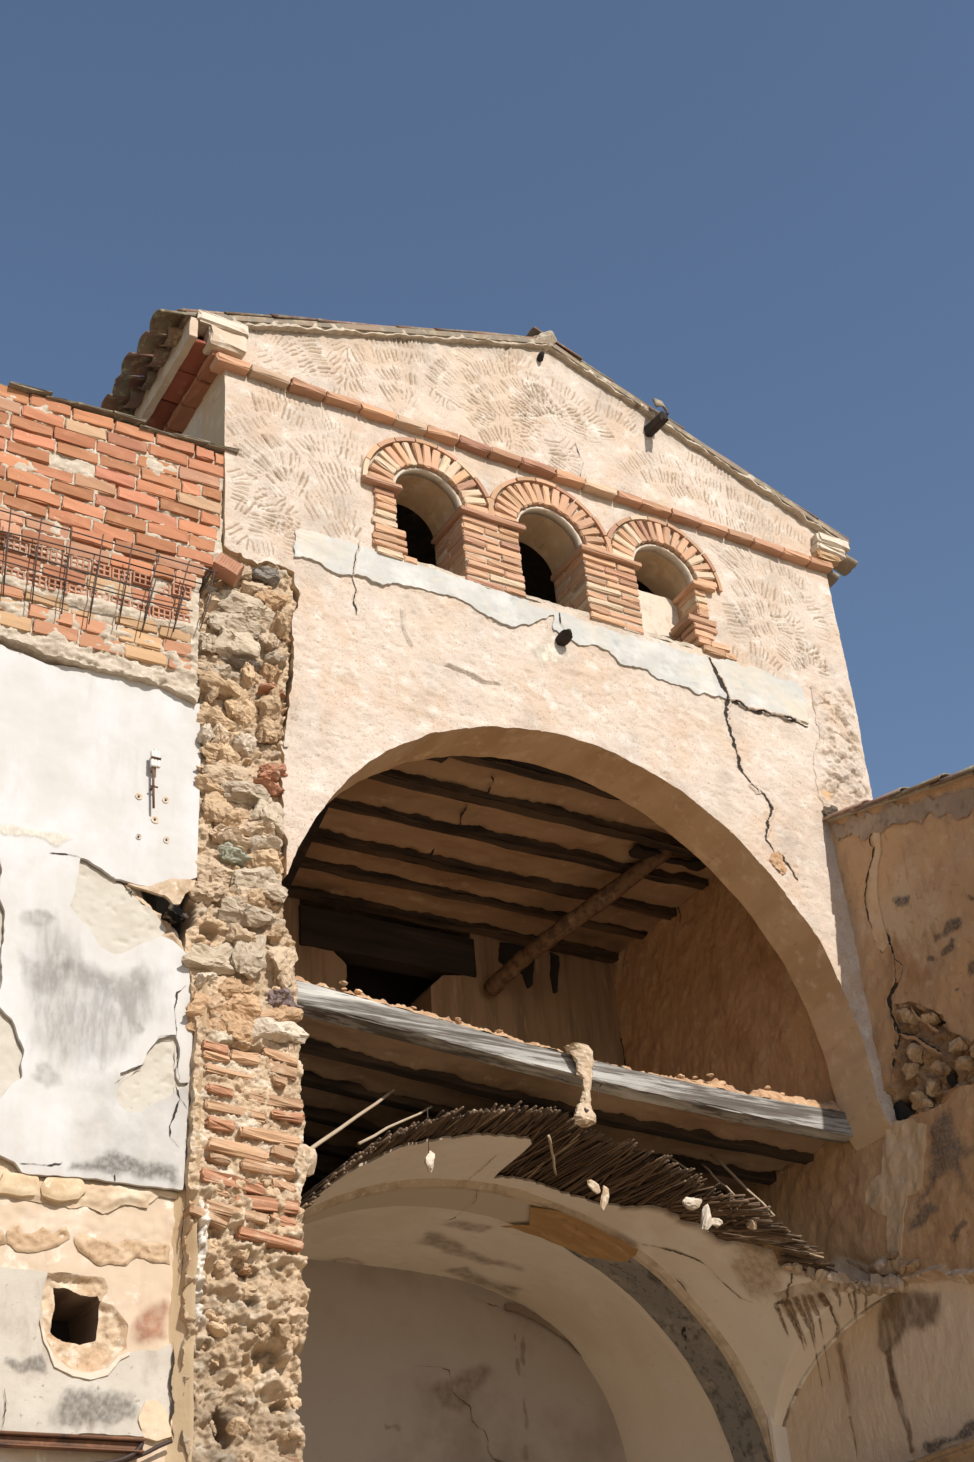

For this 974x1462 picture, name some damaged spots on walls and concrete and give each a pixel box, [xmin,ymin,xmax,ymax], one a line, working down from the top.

spalling [0,507,218,632]
crack [707,656,809,879]
peeling [70,860,195,954]
flaking render [0,1011,23,1098]
peeling [116,1037,186,1113]
flaking render [0,1158,179,1214]
crack [427,1366,504,1462]
leakage [775,1283,974,1453]